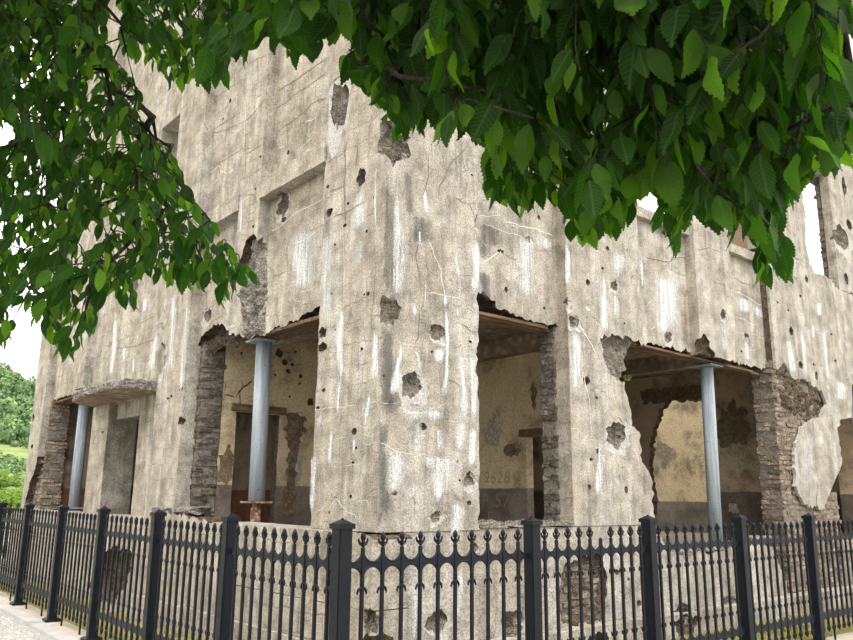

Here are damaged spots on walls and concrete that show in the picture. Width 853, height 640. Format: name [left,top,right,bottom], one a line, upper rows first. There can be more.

spalling [325,77,351,158]
flaking render [813,177,853,279]
flaking render [31,400,70,509]
flaking render [190,238,268,515]
flaking render [279,413,308,517]
spalling [398,372,429,415]
spalling [429,324,451,353]
spalling [600,334,635,381]
spalling [604,417,631,457]
flaking render [717,360,844,592]